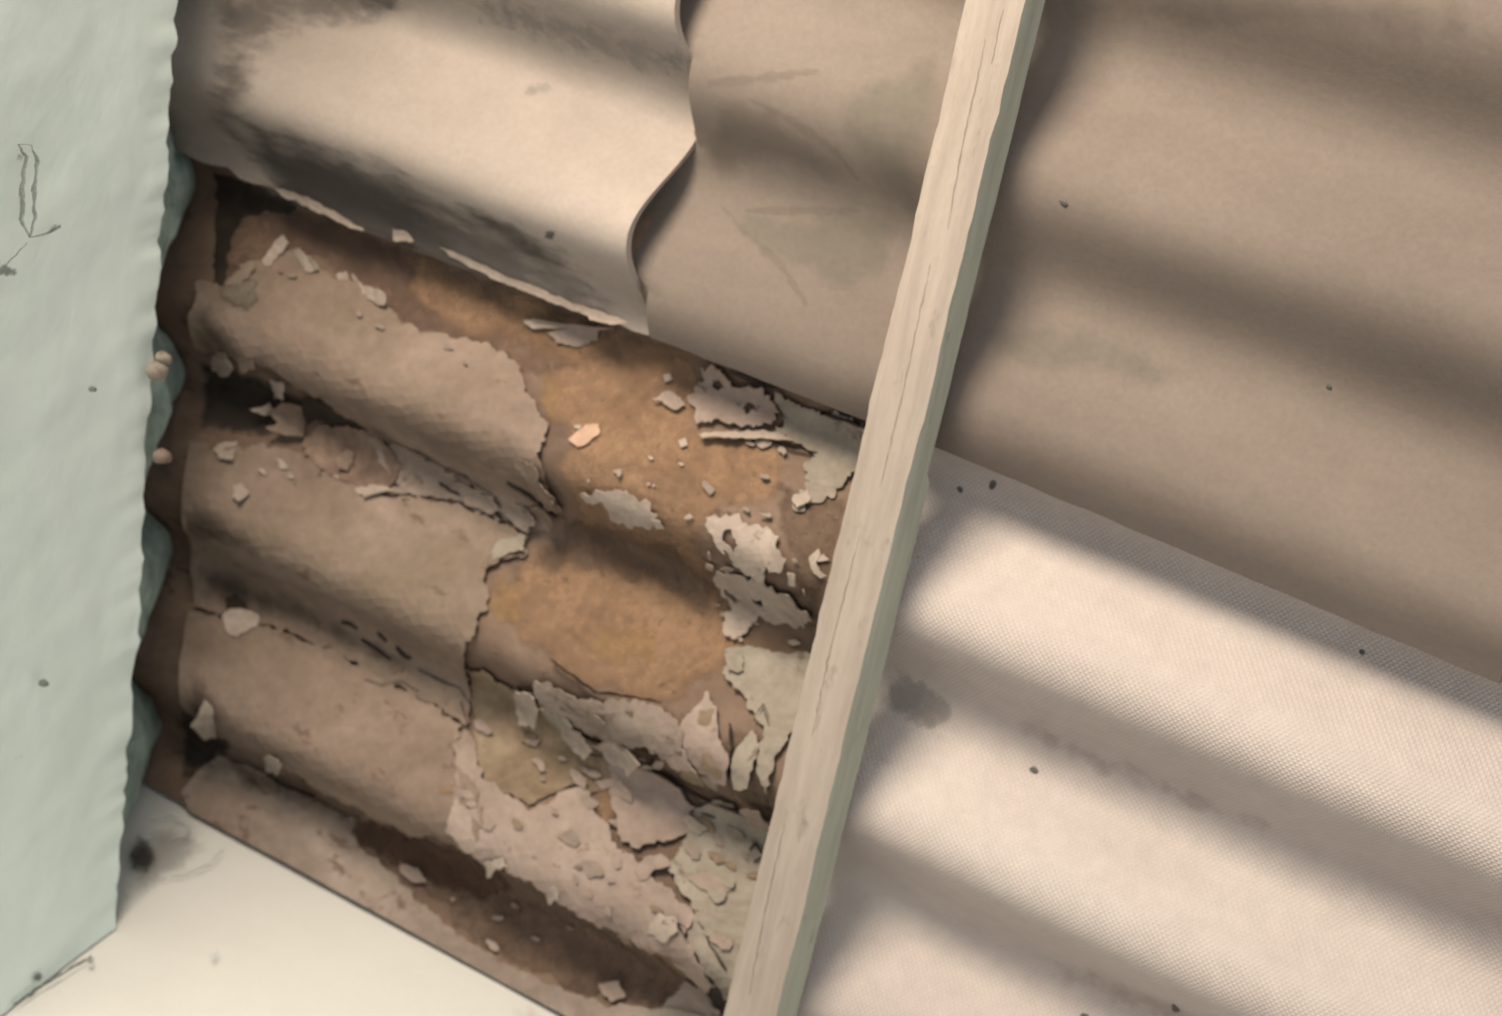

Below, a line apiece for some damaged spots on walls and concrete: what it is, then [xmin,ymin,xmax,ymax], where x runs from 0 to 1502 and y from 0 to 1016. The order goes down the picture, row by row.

peeling [273,187,364,231]
peeling [392,229,414,243]
leakage [227,210,637,373]
peeling [652,364,866,512]
corrosion [500,343,778,699]
peeling [179,235,769,1016]
peeling [684,506,831,794]